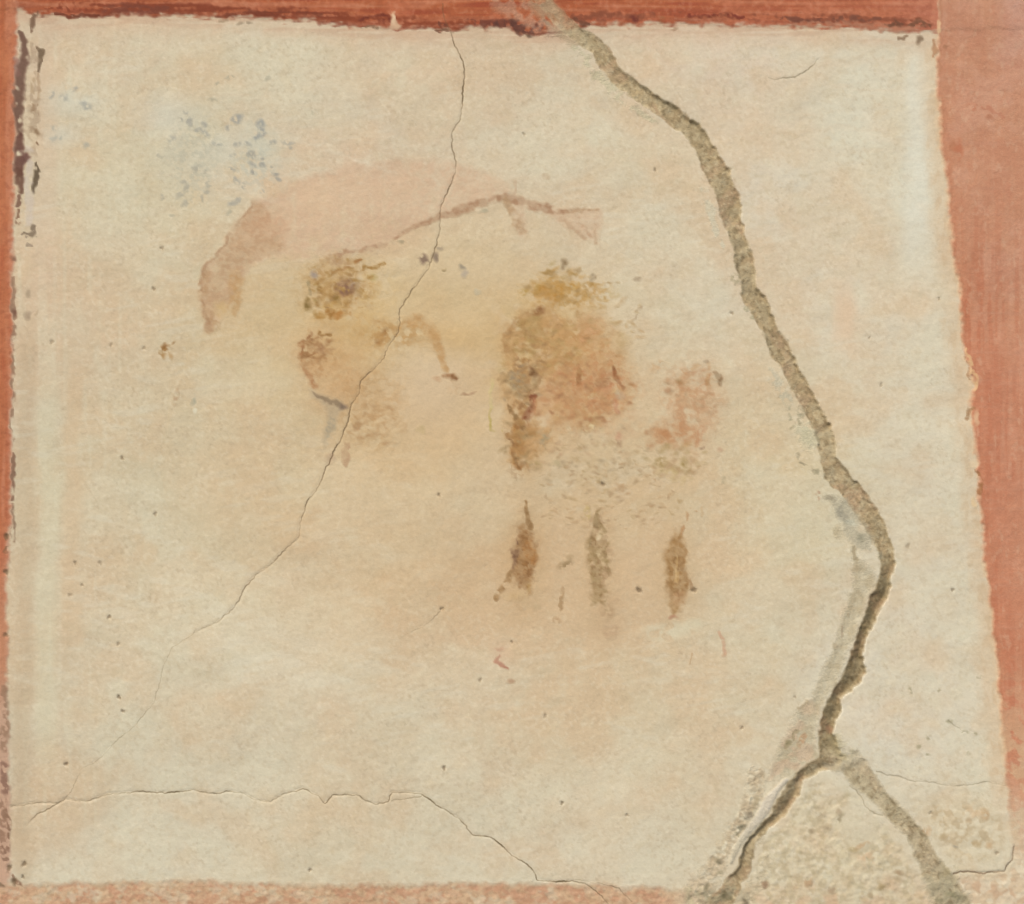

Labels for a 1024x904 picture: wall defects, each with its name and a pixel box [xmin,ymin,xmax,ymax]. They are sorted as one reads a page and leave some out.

peeling [2,276,39,554]
peeling [9,0,557,263]
crack [10,3,632,904]
crack [488,0,1015,904]